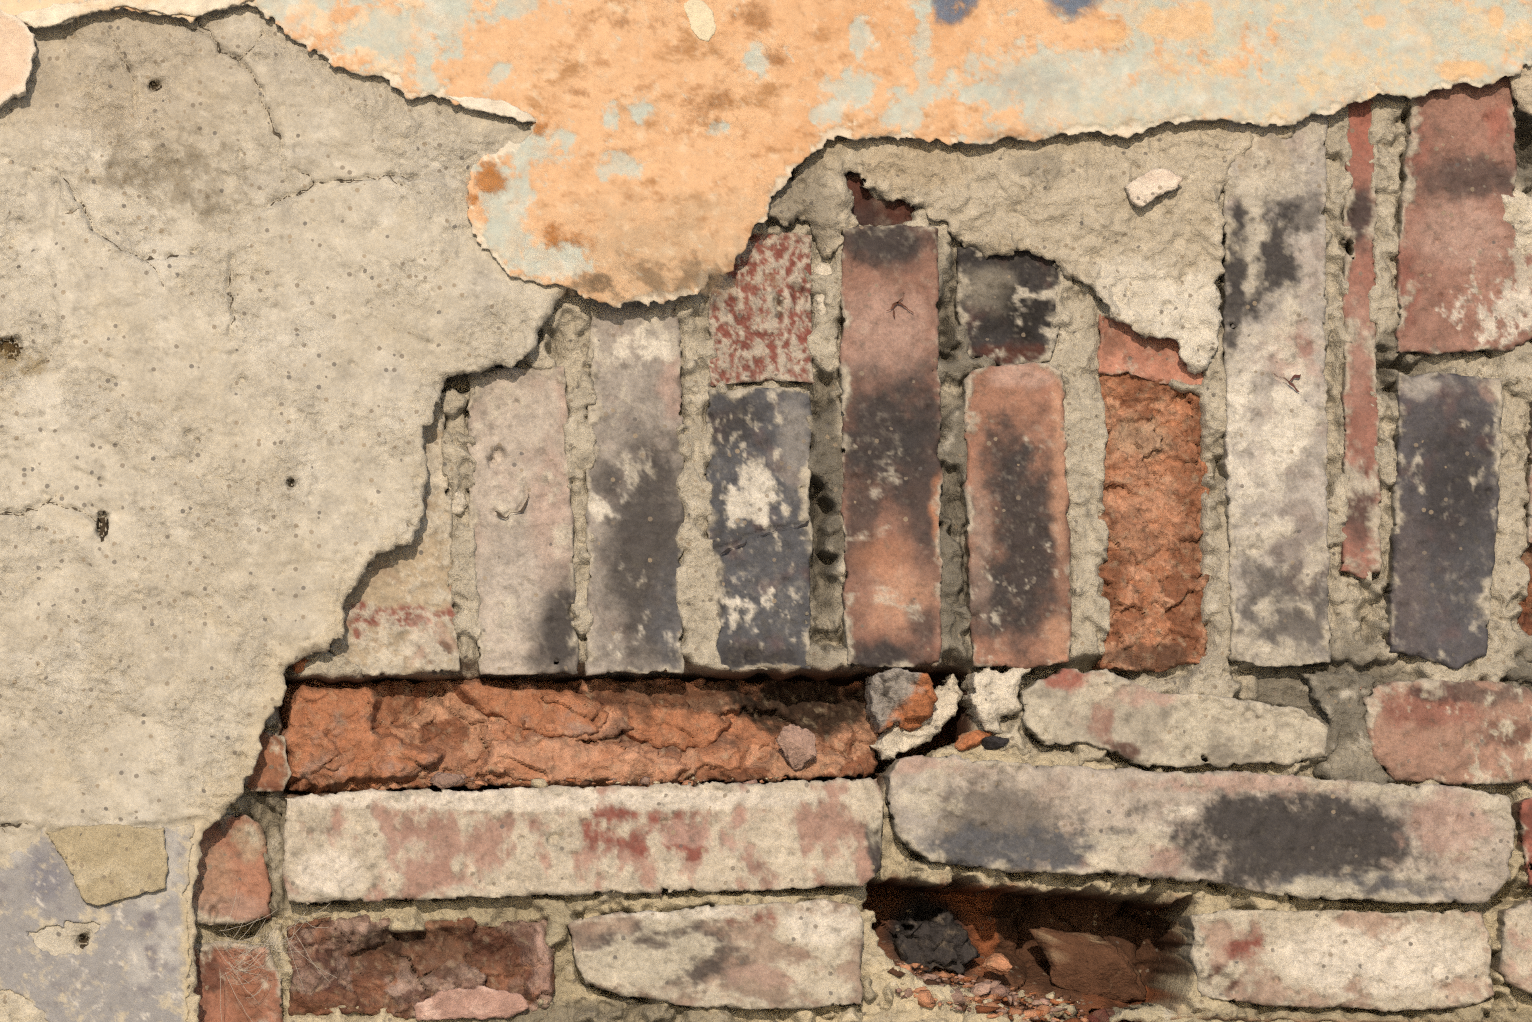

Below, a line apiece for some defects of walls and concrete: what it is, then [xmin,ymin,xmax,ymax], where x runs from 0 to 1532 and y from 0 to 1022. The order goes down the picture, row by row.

peeling [0,0,252,109]
crack [191,23,407,206]
peeling [447,96,536,123]
crack [64,178,179,287]
flaking render [1124,168,1183,208]
crack [228,264,236,338]
spalling [1092,372,1210,672]
spalling [1517,543,1532,636]
spalling [280,676,880,794]
peeling [0,824,195,1022]
spalling [286,914,556,1021]
spalling [1087,1008,1134,1022]